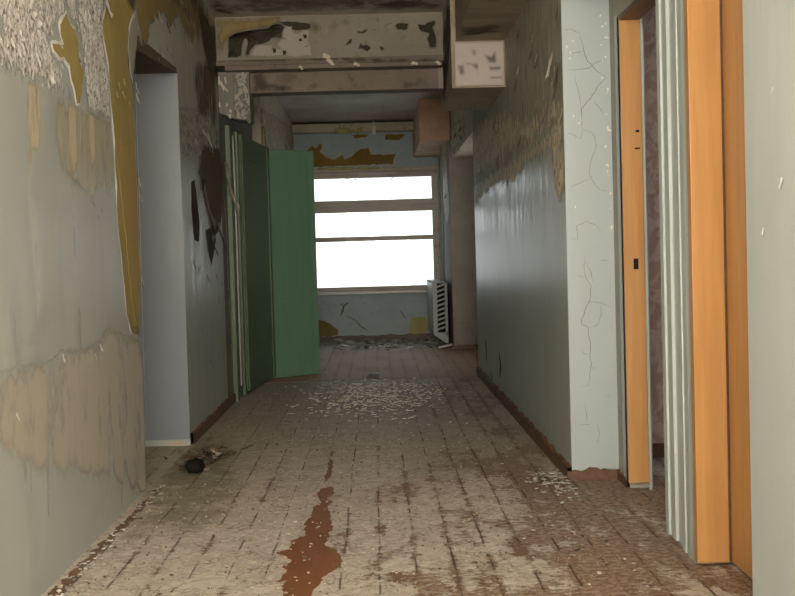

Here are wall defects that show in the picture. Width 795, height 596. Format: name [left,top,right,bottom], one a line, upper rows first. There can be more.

peeling [0,0,195,352]
peeling [180,65,251,306]
spalling [227,21,311,70]
peeling [305,134,397,169]
spalling [345,28,385,52]
spalling [395,20,437,49]
peeling [439,53,564,222]
crack [564,29,609,192]
crack [571,221,609,442]
peeling [47,500,149,596]
peeling [276,459,343,596]
peeling [364,546,422,590]